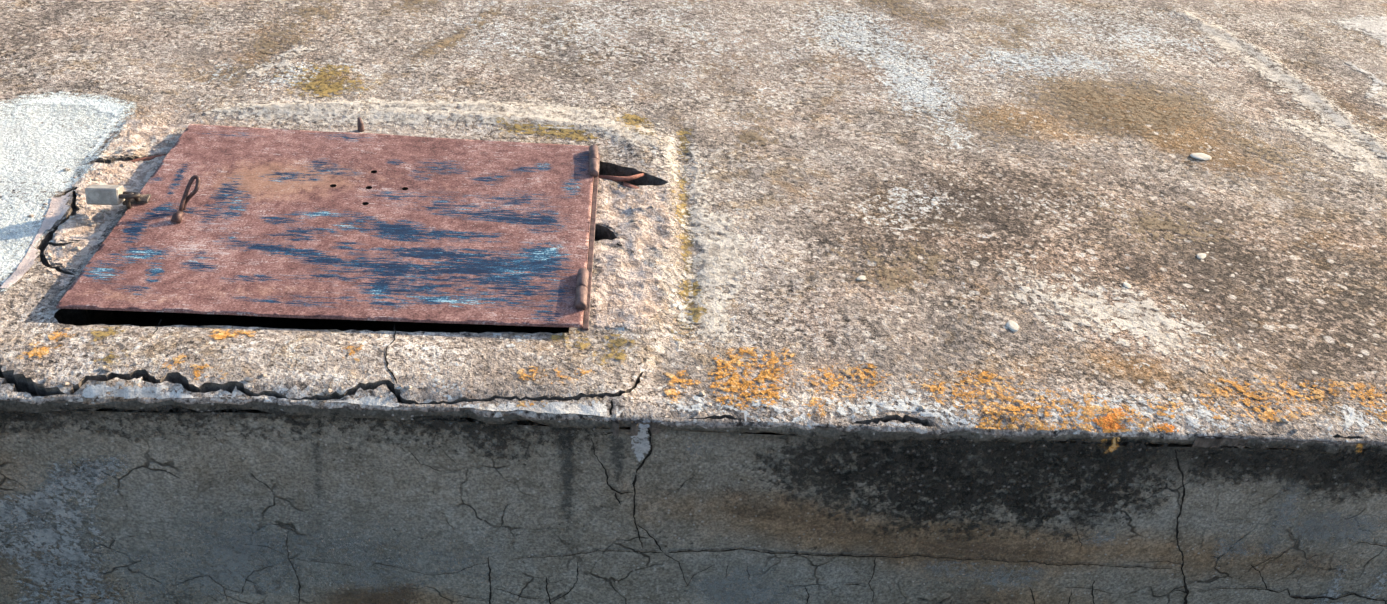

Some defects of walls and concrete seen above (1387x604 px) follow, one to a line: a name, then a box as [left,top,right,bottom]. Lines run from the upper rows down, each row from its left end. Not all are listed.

crack [0,324,1387,604]
damp [663,390,1387,555]